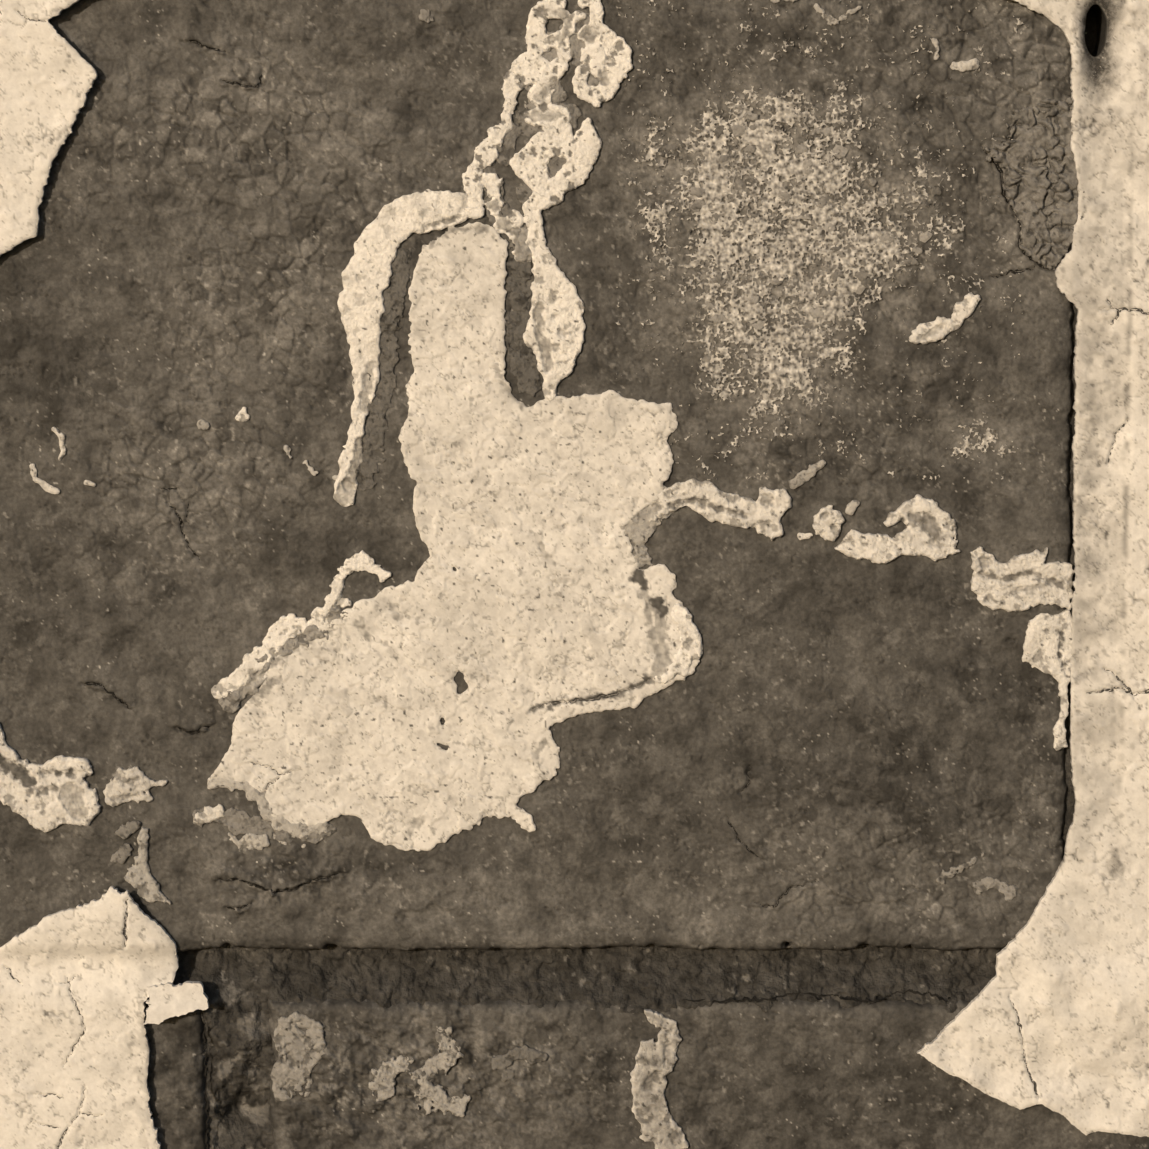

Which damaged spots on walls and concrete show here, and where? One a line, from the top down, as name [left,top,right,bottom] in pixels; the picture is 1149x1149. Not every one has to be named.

peeling [0,0,98,256]
crack [982,97,1085,278]
crack [1104,299,1149,325]
peeling [192,0,1023,863]
peeling [797,0,1149,1137]
crack [1088,669,1149,696]
peeling [0,725,168,833]
crack [40,1093,102,1149]
peeling [0,820,209,1149]
crack [121,899,129,947]
peeling [630,1009,689,1149]
crack [1010,1000,1038,1095]